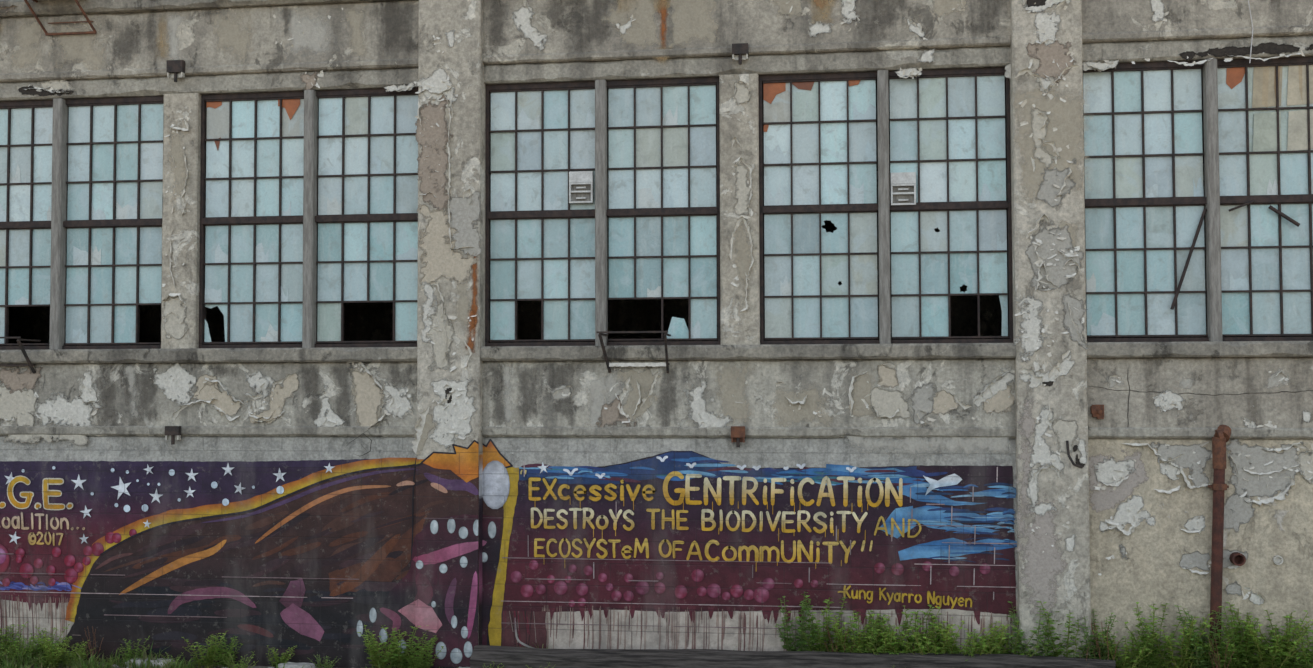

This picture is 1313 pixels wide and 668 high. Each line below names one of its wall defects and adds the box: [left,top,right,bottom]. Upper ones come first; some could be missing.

peeling [773,0,860,38]
peeling [896,17,935,79]
peeling [1004,0,1150,93]
peeling [1150,0,1169,22]
spalling [1167,42,1313,66]
peeling [314,30,482,454]
peeling [0,363,101,446]
peeling [150,363,299,424]
peeling [552,385,573,399]
peeling [589,369,660,428]
peeling [681,380,733,428]
peeling [847,159,1313,616]